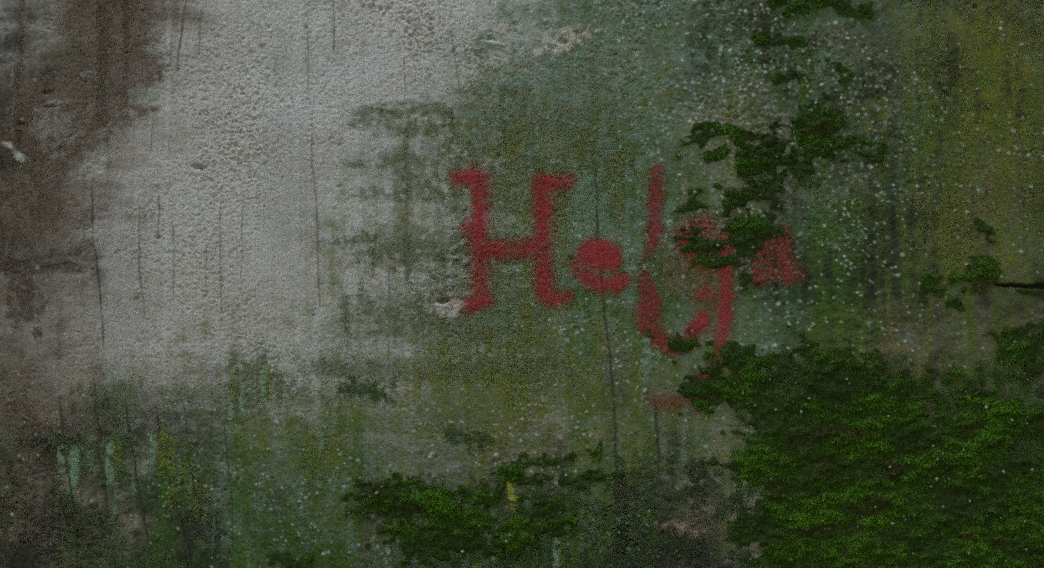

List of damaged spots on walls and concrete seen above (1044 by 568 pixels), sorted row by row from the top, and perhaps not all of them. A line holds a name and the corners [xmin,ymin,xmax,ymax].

crack [985,282,1044,290]
water stain [57,446,79,486]
water stain [105,441,116,481]
water stain [613,457,742,568]